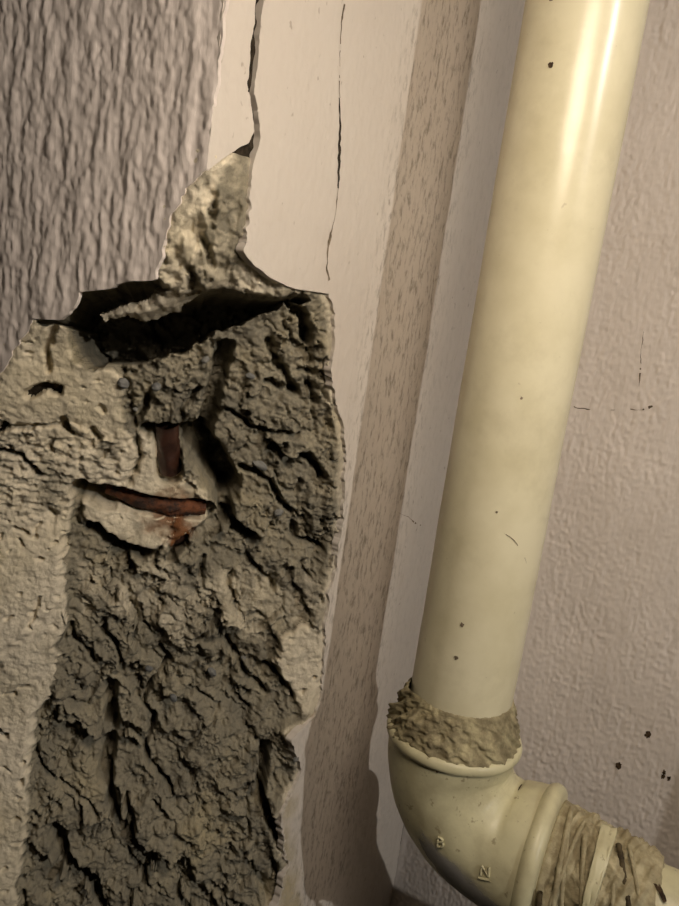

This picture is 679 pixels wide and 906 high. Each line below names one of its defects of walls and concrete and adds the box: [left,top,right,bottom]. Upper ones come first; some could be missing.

crack [232,0,259,158]
crack [326,4,345,281]
spalling [0,153,344,906]
rust [156,512,189,547]